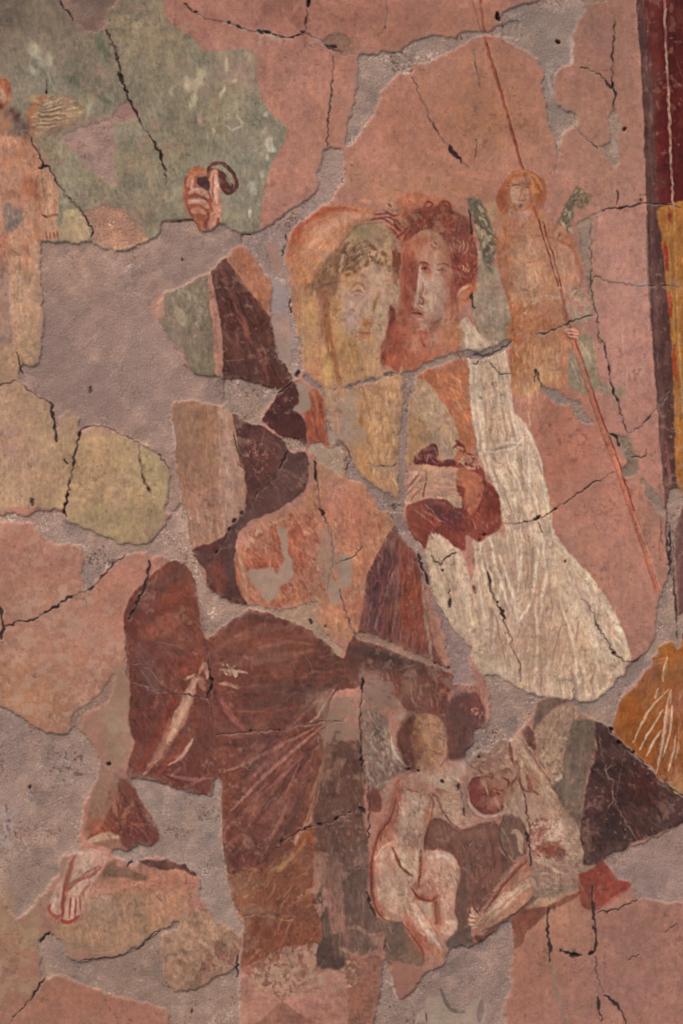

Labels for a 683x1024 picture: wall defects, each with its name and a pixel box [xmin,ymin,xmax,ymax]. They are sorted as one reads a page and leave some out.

crack [106,30,168,179]
crack [228,0,340,147]
crack [0,353,169,519]
flaking render [0,0,607,761]
flaking render [618,436,683,552]
crack [0,556,372,848]
crack [488,572,522,674]
flaking render [571,570,683,726]
flaking render [0,665,245,935]
flaking render [604,823,683,905]
flaking render [374,921,514,1024]
crack [546,886,638,1024]